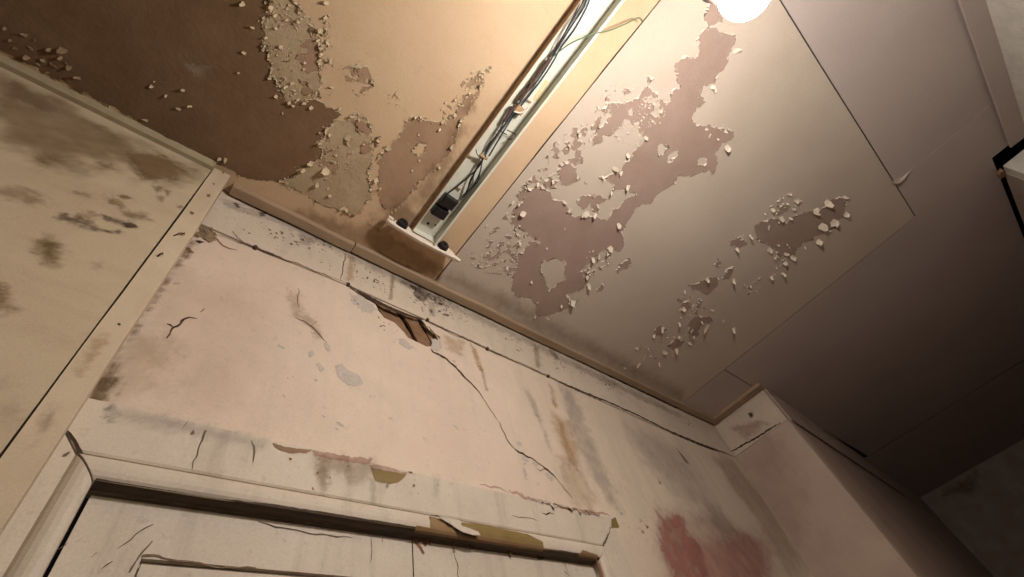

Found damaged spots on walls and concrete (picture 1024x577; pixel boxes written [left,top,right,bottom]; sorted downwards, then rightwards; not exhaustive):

damp [1,84,184,179]
peeling [0,0,492,218]
peeling [467,3,742,320]
crack [166,308,205,338]
crack [211,229,346,341]
damp [234,203,333,270]
flaking render [349,285,443,368]
damp [354,262,476,322]
peeling [624,193,850,369]
crack [429,321,905,520]
peeling [369,465,412,484]
peeling [480,484,619,528]